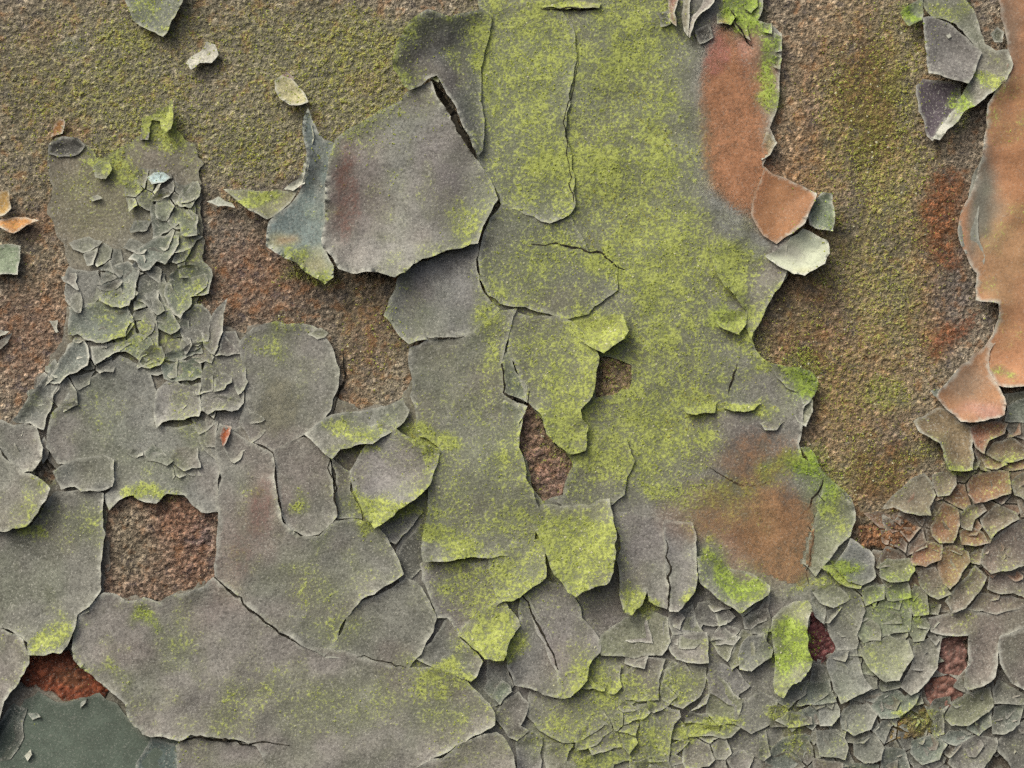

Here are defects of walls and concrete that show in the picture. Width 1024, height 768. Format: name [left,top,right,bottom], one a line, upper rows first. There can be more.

crack [433,83,477,158]
corrosion [702,27,770,212]
peeling [224,109,334,284]
crack [531,242,625,270]
water stain [703,192,768,259]
peeling [864,0,1024,615]
peeling [0,180,245,761]
crack [214,577,300,645]
peeling [200,321,410,536]
crack [664,541,672,609]
corrosion [706,442,814,583]
corrosion [859,517,916,551]